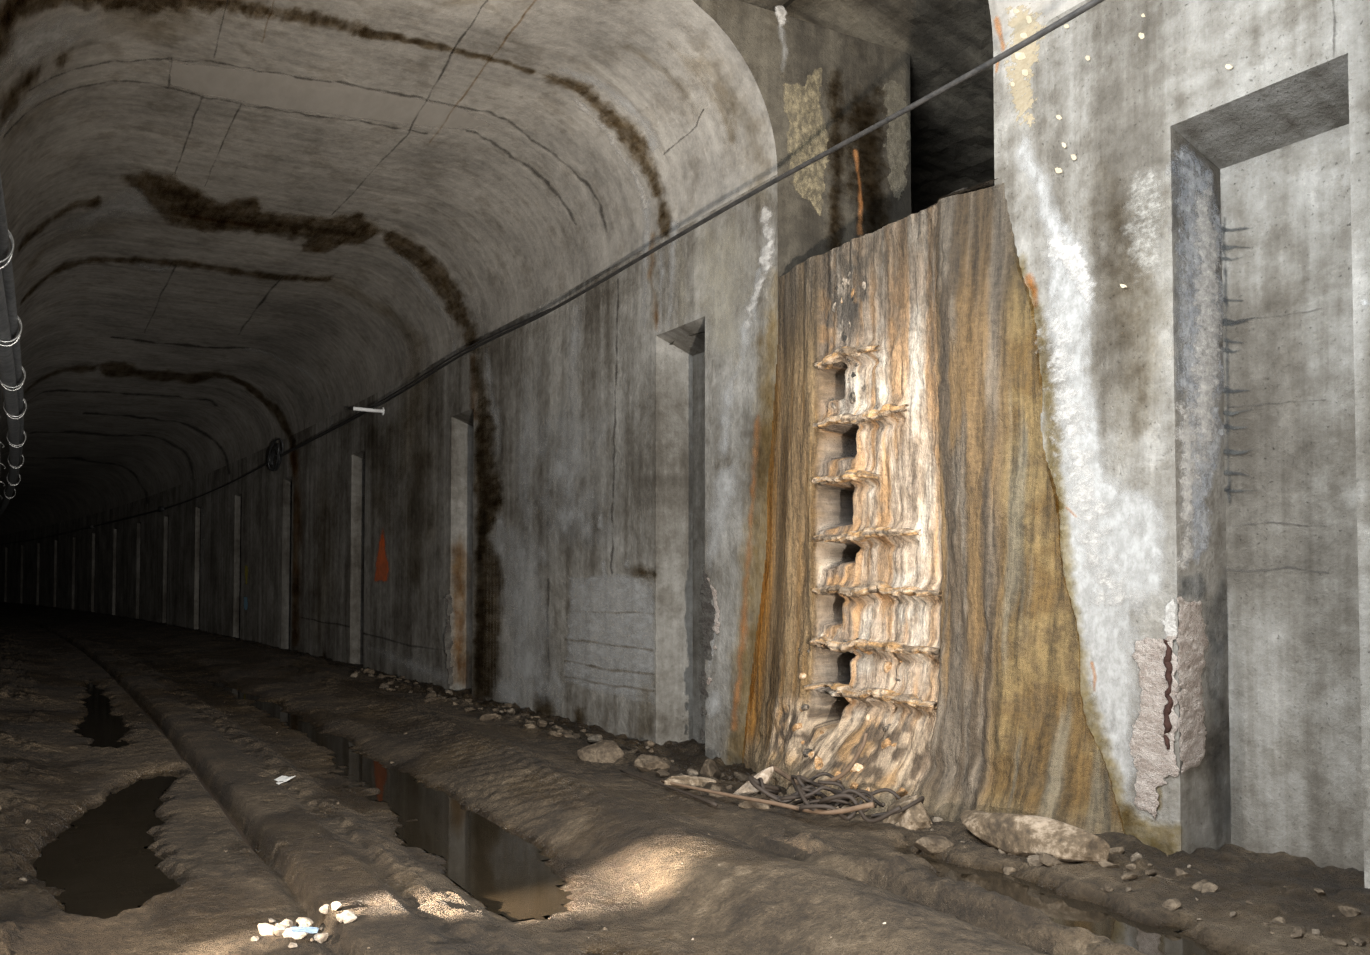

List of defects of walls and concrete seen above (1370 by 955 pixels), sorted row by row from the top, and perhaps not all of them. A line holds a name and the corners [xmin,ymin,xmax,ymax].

leakage [0,0,534,119]
leakage [552,72,676,279]
peeling [784,68,828,216]
leakage [74,174,561,714]
leakage [1019,145,1162,800]
spalling [1129,596,1209,819]